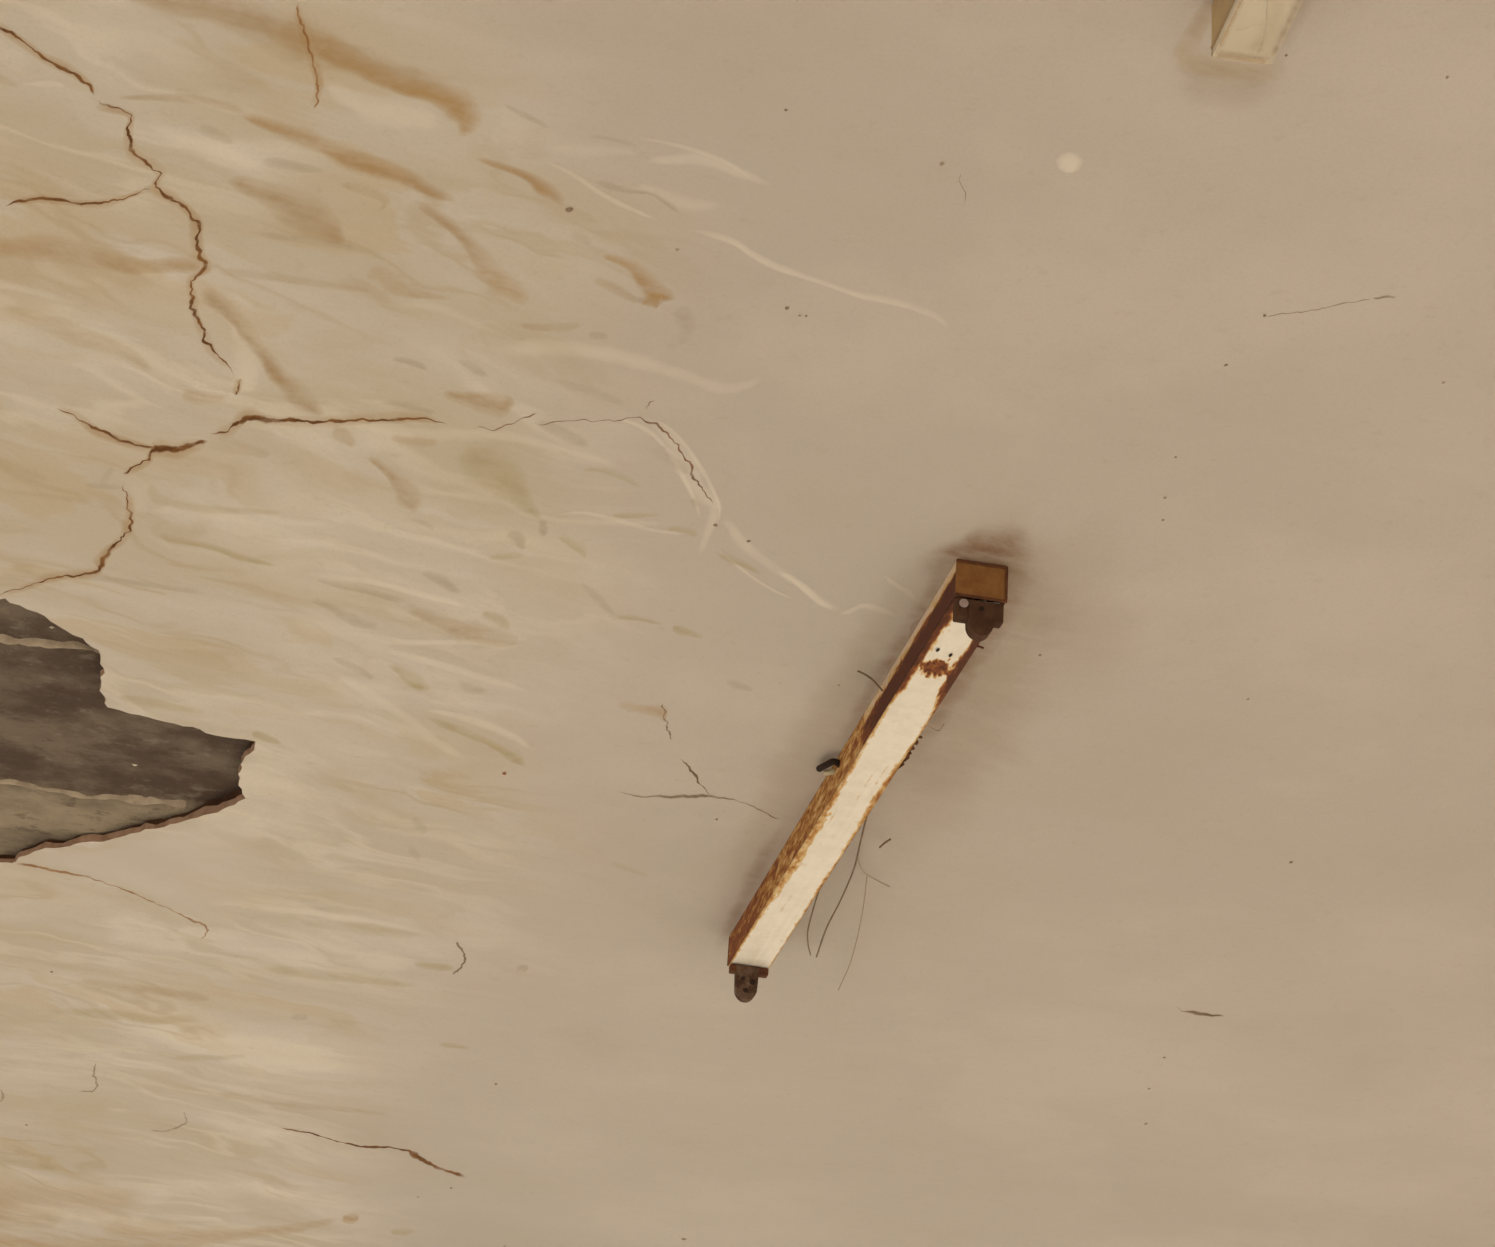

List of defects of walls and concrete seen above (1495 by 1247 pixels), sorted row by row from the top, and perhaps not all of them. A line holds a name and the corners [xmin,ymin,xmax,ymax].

crack [293,3,327,109]
crack [0,19,714,599]
water stain [0,0,871,619]
water stain [533,135,961,337]
spalling [0,598,255,863]
water stain [82,464,546,770]
crack [617,703,782,820]
rust [696,479,1169,956]
crack [13,862,210,940]
water stain [244,896,457,990]
water stain [0,1151,361,1247]
crack [277,1127,467,1178]